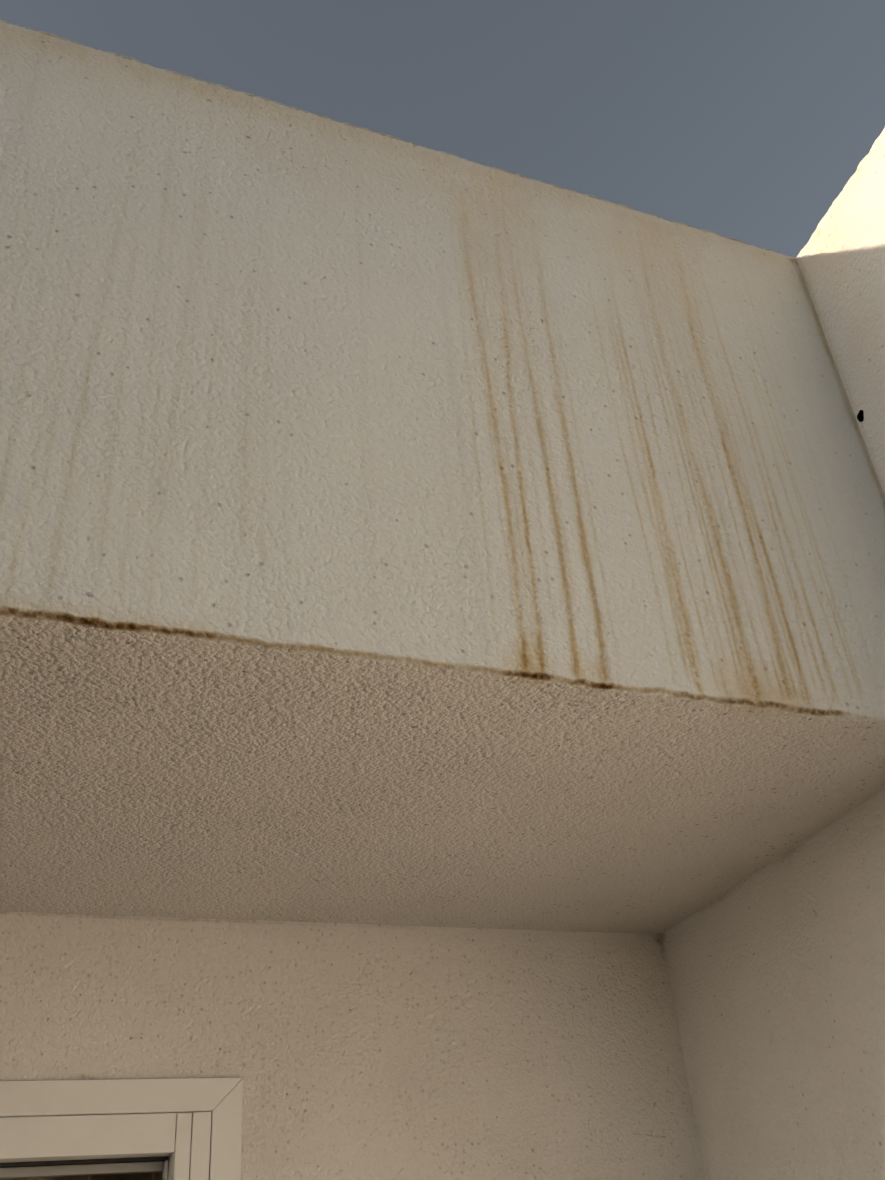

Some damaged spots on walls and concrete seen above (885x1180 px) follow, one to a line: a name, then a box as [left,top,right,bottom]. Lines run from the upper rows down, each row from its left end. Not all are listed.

rust [69,619,148,630]